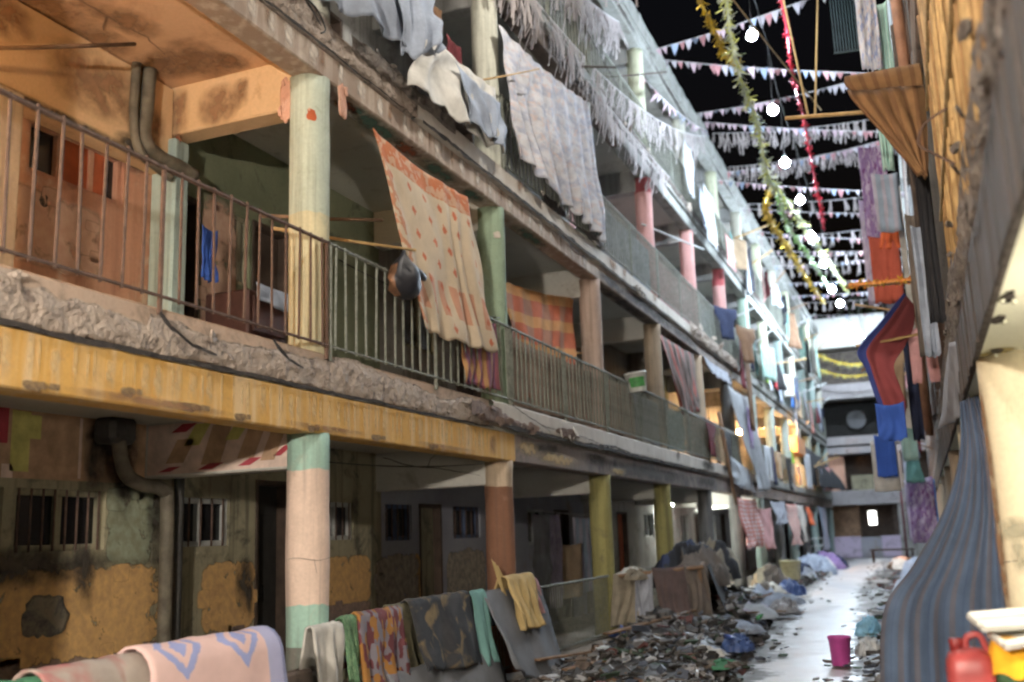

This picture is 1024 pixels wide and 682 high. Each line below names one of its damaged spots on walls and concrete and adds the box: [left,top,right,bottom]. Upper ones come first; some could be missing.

damp [143,48,239,74]
damp [173,95,185,128]
damp [202,80,247,122]
spalling [0,184,542,435]
damp [87,425,130,499]
damp [149,494,160,540]
peeling [0,485,160,681]
peeling [197,561,257,634]
peeling [329,553,419,622]